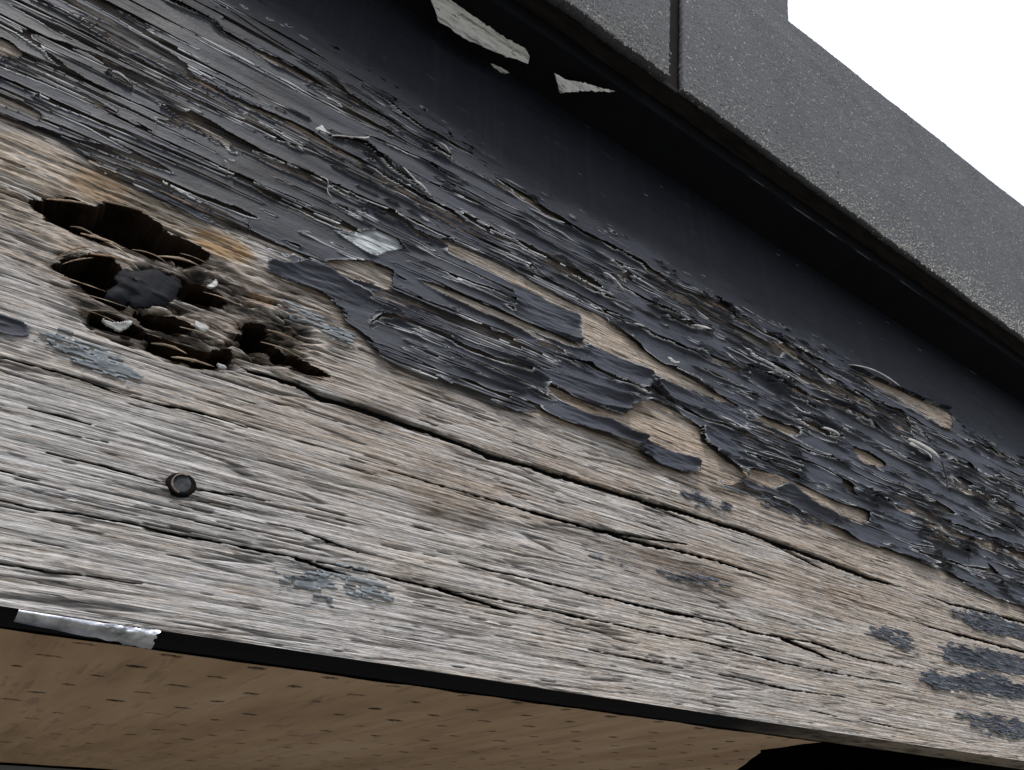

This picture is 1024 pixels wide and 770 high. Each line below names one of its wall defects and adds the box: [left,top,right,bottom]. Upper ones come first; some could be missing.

peeling [0,0,246,175]
peeling [0,314,144,380]
peeling [267,230,868,525]
peeling [842,366,980,463]
crack [190,488,266,501]
crack [244,369,905,588]
crack [0,500,914,717]
peeling [864,625,916,650]
crack [913,621,1024,653]
peeling [919,641,1024,700]
crack [928,596,1024,624]
peeling [955,711,1024,739]